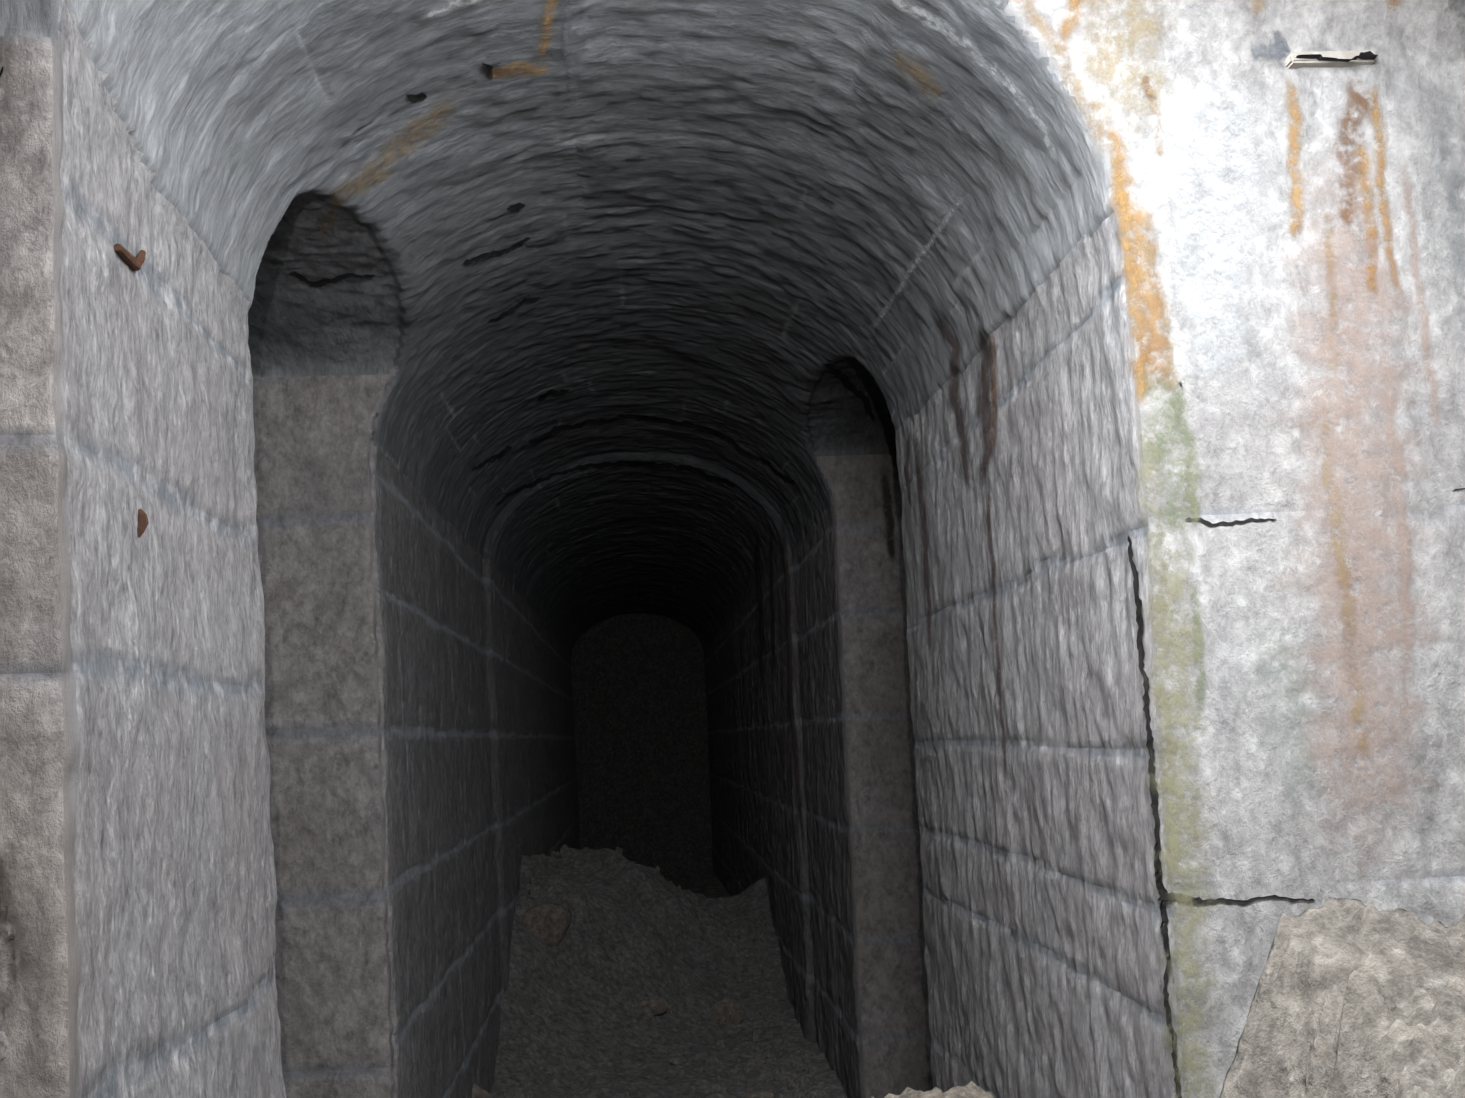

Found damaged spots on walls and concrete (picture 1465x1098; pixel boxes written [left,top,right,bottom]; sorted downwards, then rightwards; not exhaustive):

rust [1027,0,1081,51]
rust [1097,0,1157,106]
rust [1096,124,1170,396]
rust [1289,91,1302,232]
rust [1327,87,1398,318]
crack [1185,517,1276,527]
crack [1127,536,1315,1098]